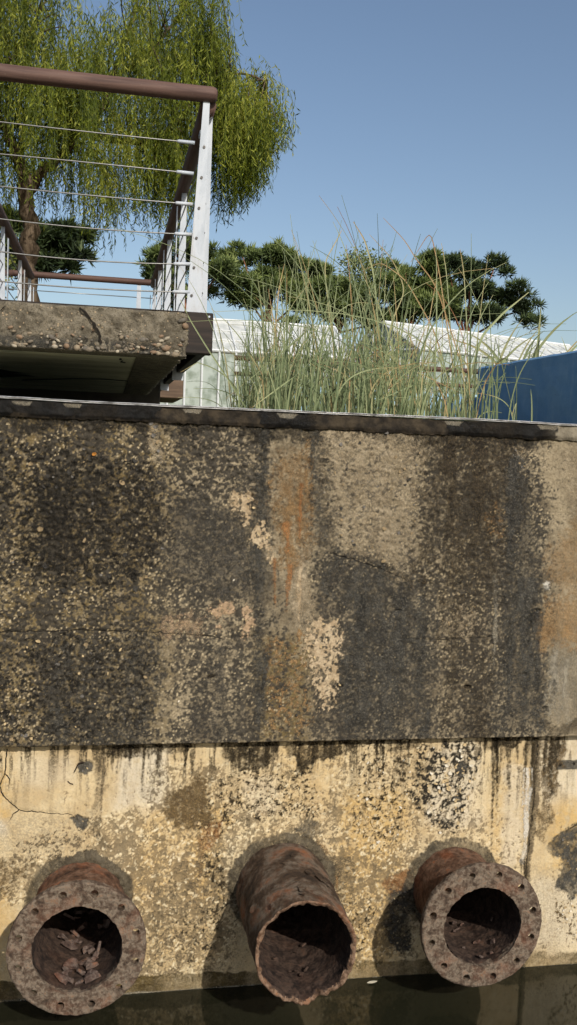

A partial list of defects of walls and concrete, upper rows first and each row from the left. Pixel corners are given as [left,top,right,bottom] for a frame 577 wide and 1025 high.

water stain [0,399,181,433]
corrosion [267,444,316,601]
water stain [18,412,576,881]
crack [0,749,71,820]
water stain [0,860,33,892]
water stain [174,853,228,963]
water stain [329,855,378,952]